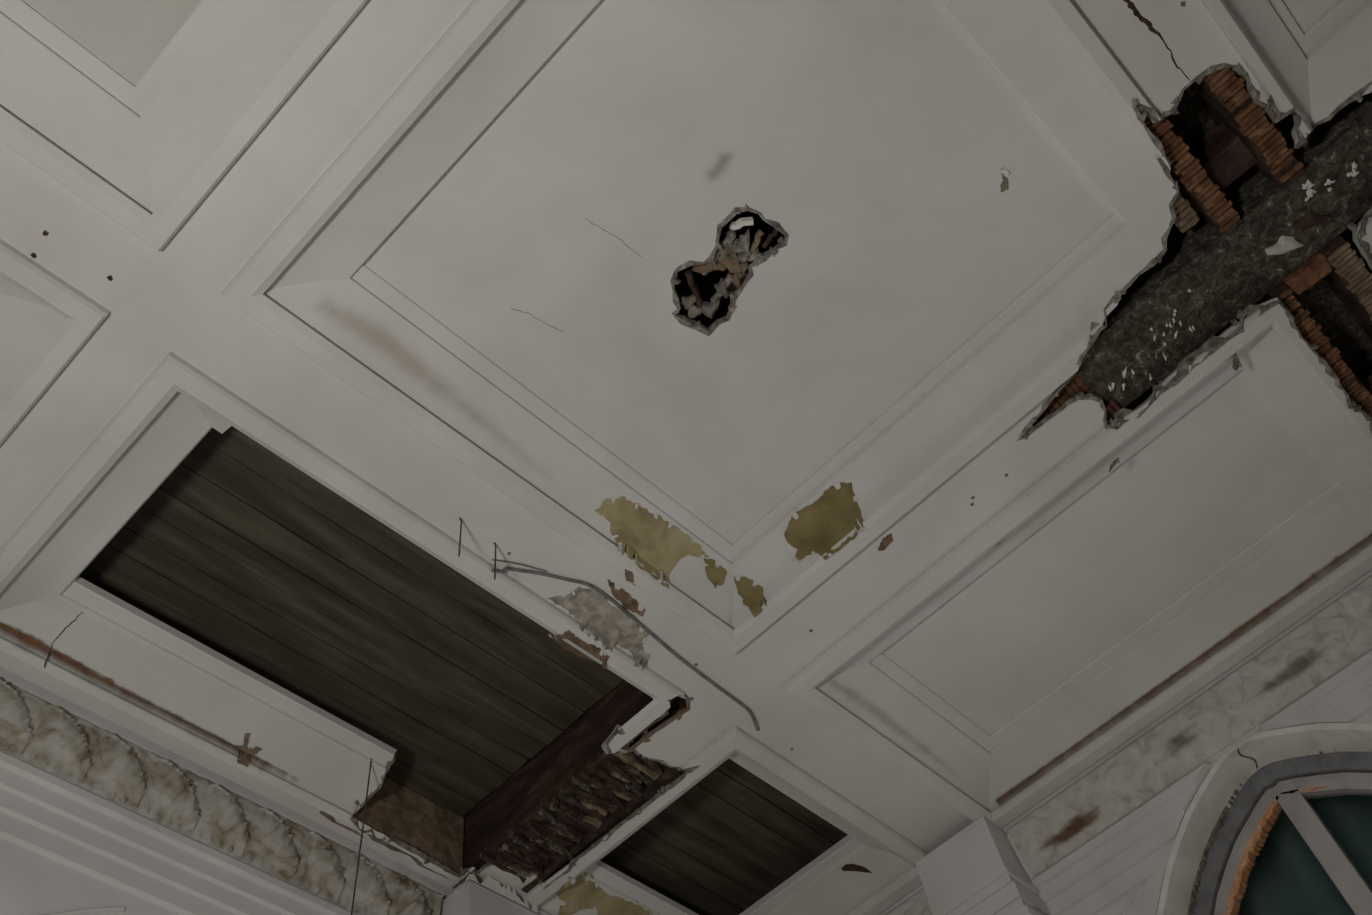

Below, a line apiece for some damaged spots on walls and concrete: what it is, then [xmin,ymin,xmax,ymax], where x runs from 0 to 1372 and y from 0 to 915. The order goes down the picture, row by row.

crack [1123,0,1190,81]
spalling [671,204,789,336]
peeling [1232,352,1243,371]
peeling [784,482,864,564]
peeling [547,496,767,670]
spalling [621,694,694,751]
peeling [556,872,653,915]